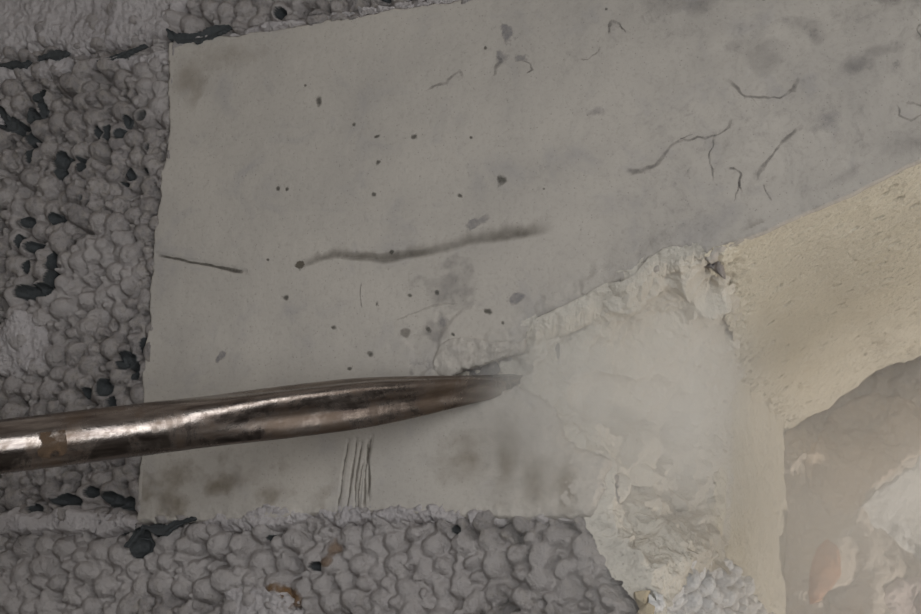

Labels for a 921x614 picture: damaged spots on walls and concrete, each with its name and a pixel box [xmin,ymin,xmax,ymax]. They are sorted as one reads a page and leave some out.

crack [164,256,241,273]
spalling [433,243,745,614]